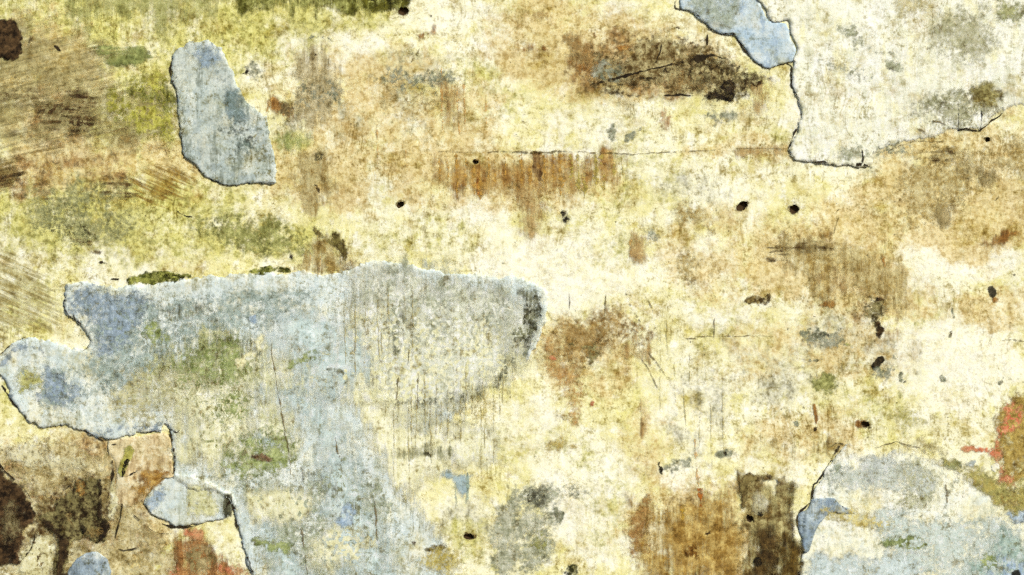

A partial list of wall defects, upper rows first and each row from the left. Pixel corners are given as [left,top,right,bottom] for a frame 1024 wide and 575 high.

peeling [171,39,277,186]
damp [563,26,770,113]
peeling [680,0,1024,168]
corrosion [433,147,623,238]
peeling [0,259,548,575]
corrosion [546,309,653,424]
corrosion [961,395,1024,485]
peeling [737,444,1024,575]